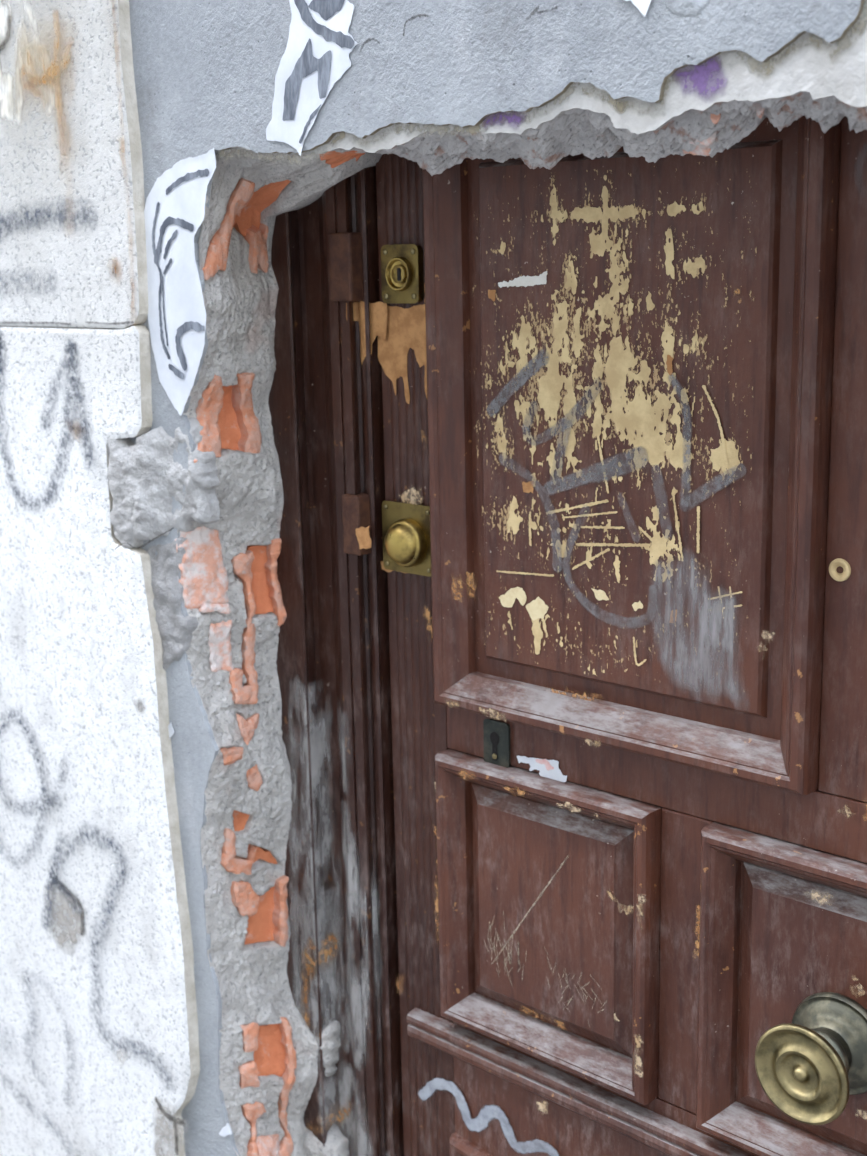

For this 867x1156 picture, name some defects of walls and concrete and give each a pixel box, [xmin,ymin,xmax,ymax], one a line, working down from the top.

peeling [346,277,427,404]
peeling [472,169,755,676]
spalling [399,488,422,505]
peeling [356,526,372,549]
spalling [452,563,482,601]
peeling [302,935,337,1007]
spalling [635,1036,643,1077]
spalling [155,1097,185,1156]